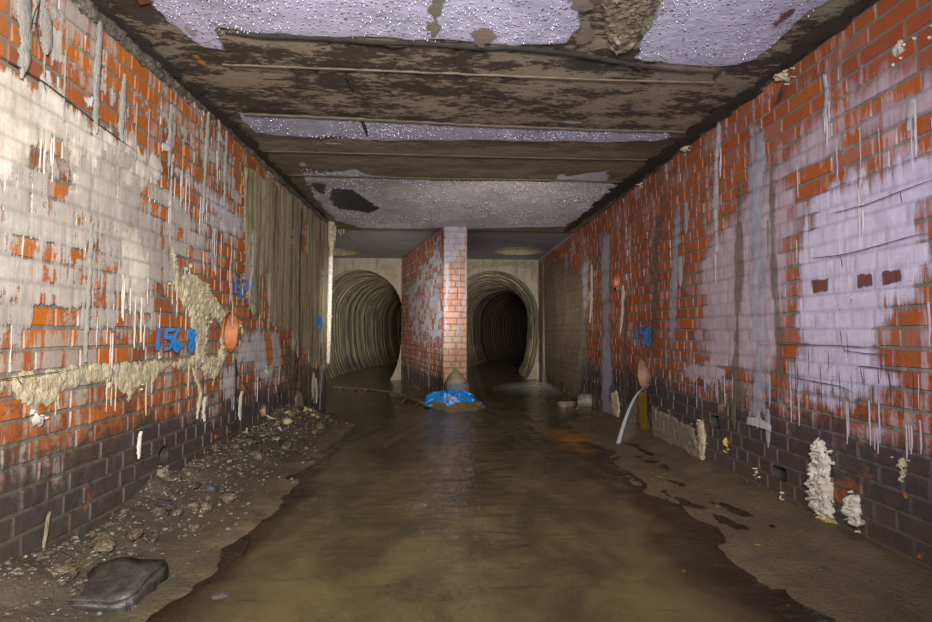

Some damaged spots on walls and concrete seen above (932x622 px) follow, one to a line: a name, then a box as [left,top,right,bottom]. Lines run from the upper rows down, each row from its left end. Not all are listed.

damp [471,28,498,48]
damp [0,0,328,437]
spalling [311,183,380,213]
damp [564,0,932,460]
damp [406,230,629,417]
damp [890,369,922,484]
damp [804,437,865,533]